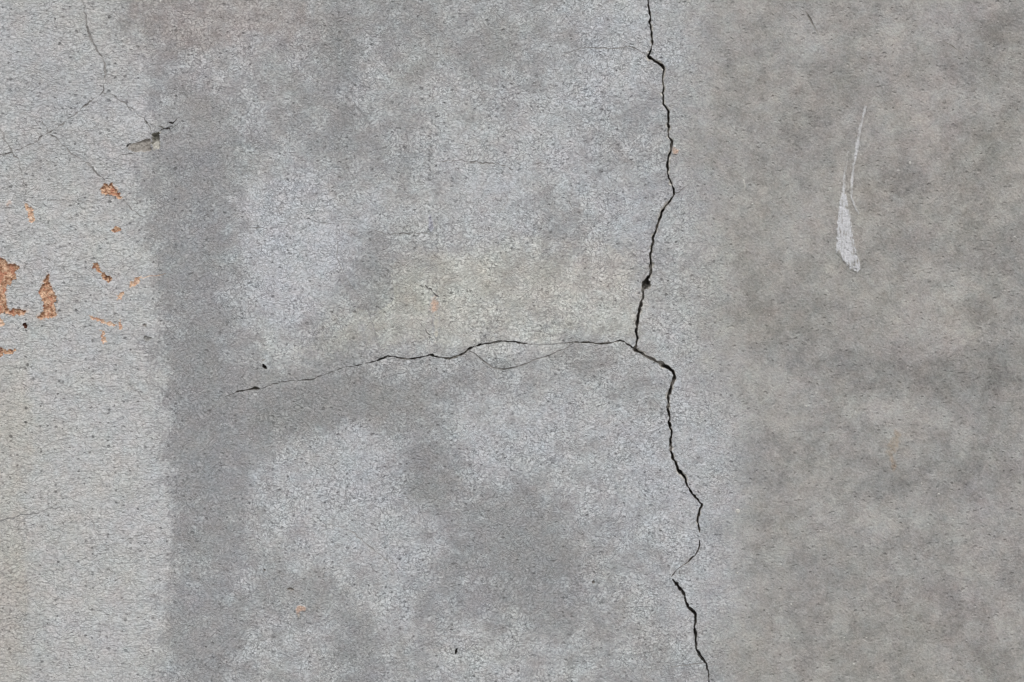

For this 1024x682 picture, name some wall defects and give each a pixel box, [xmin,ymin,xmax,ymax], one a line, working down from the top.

peeling [97,178,127,204]
peeling [0,251,63,327]
peeling [92,262,112,283]
crack [225,0,732,682]